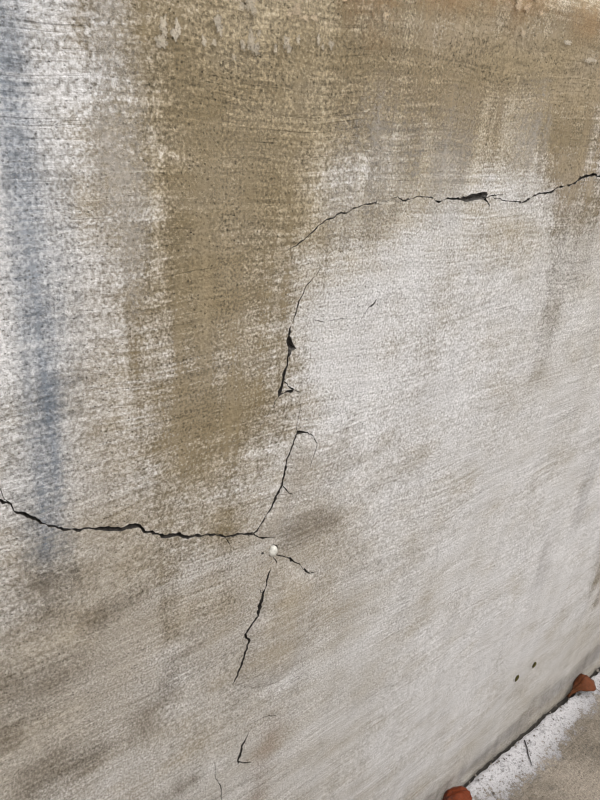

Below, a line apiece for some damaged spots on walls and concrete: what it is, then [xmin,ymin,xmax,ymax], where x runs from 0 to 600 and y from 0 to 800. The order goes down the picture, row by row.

crack [0,269,377,683]
water stain [73,0,600,585]
crack [288,196,461,250]
crack [483,173,600,206]